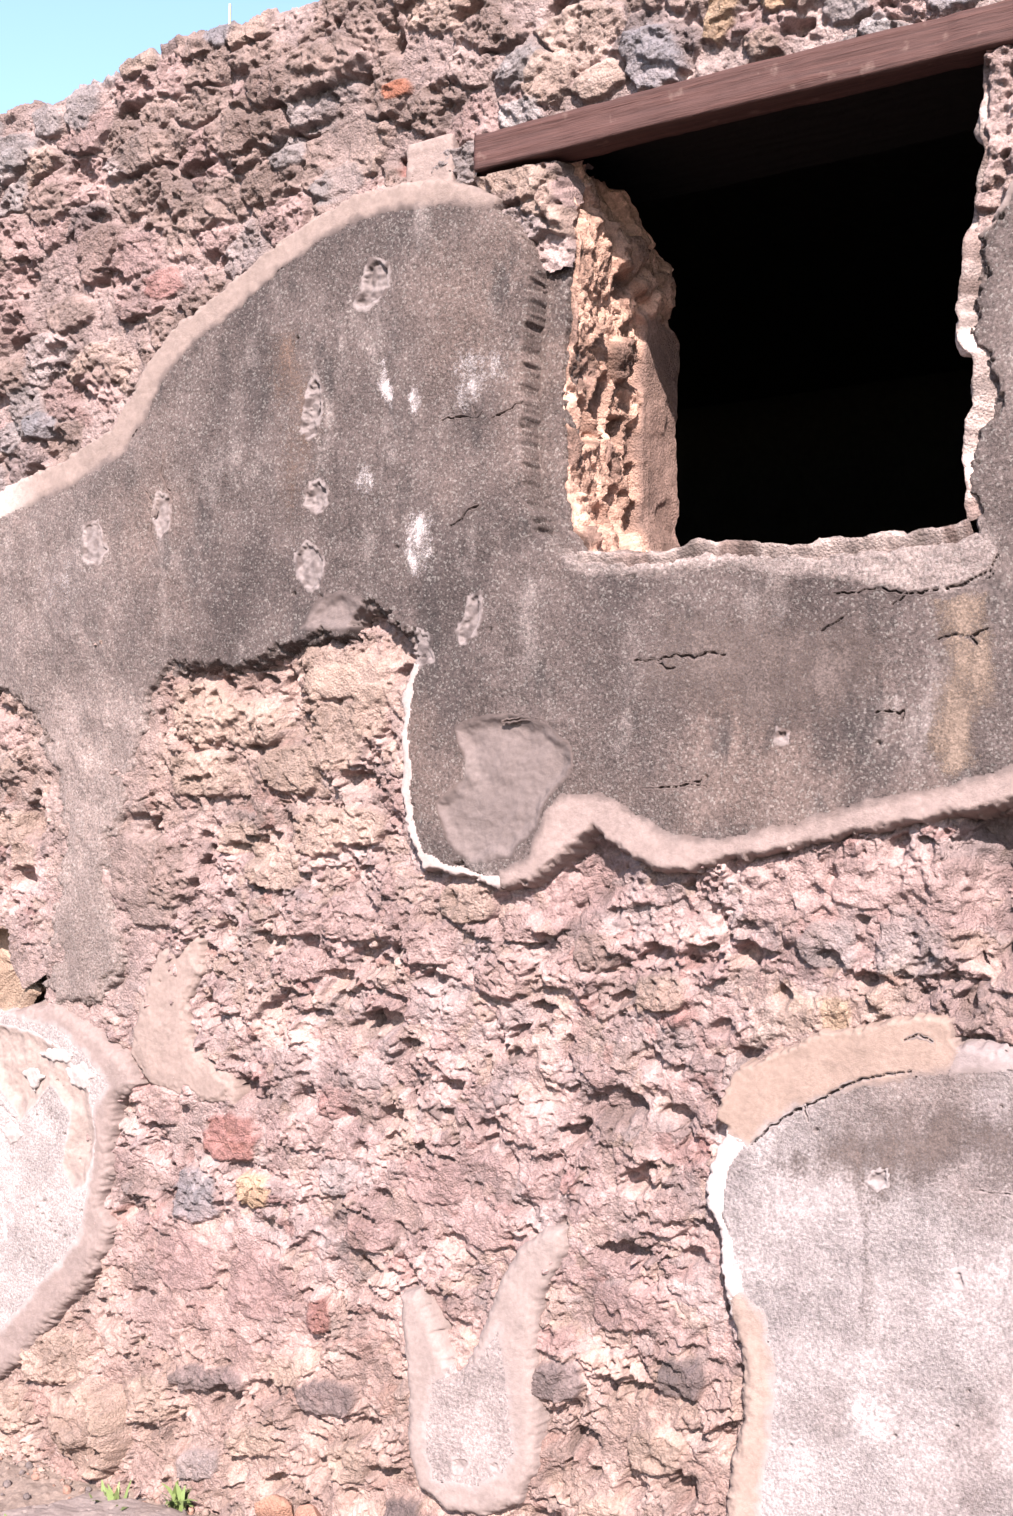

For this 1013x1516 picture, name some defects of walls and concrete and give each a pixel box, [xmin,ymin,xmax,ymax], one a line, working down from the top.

spalling [975,45,1013,248]
flaking render [352,254,393,314]
flaking render [299,374,325,442]
flaking render [81,518,110,569]
flaking render [152,490,173,542]
flaking render [302,477,330,516]
crack [819,553,1000,633]
crack [631,651,726,672]
crack [933,626,990,646]
spalling [0,539,1013,1516]
crack [750,1032,934,1148]